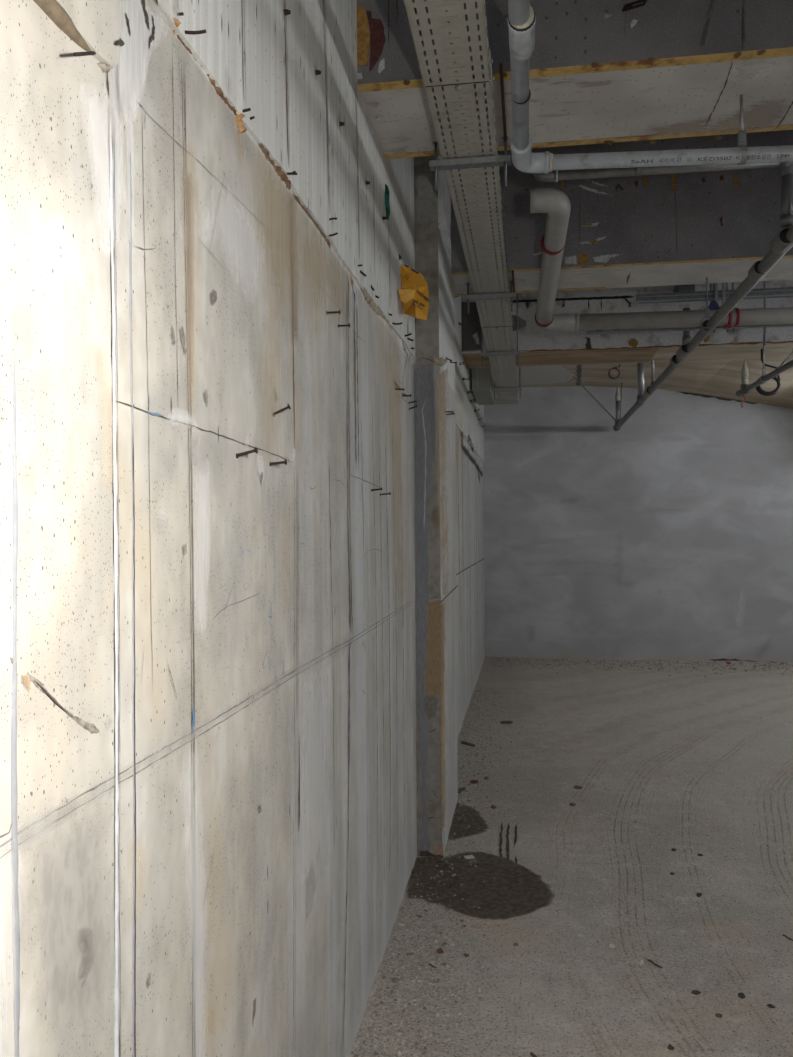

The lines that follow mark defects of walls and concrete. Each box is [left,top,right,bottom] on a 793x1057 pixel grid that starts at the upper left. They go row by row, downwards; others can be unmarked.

damp [113,0,162,238]
crack [705,61,733,128]